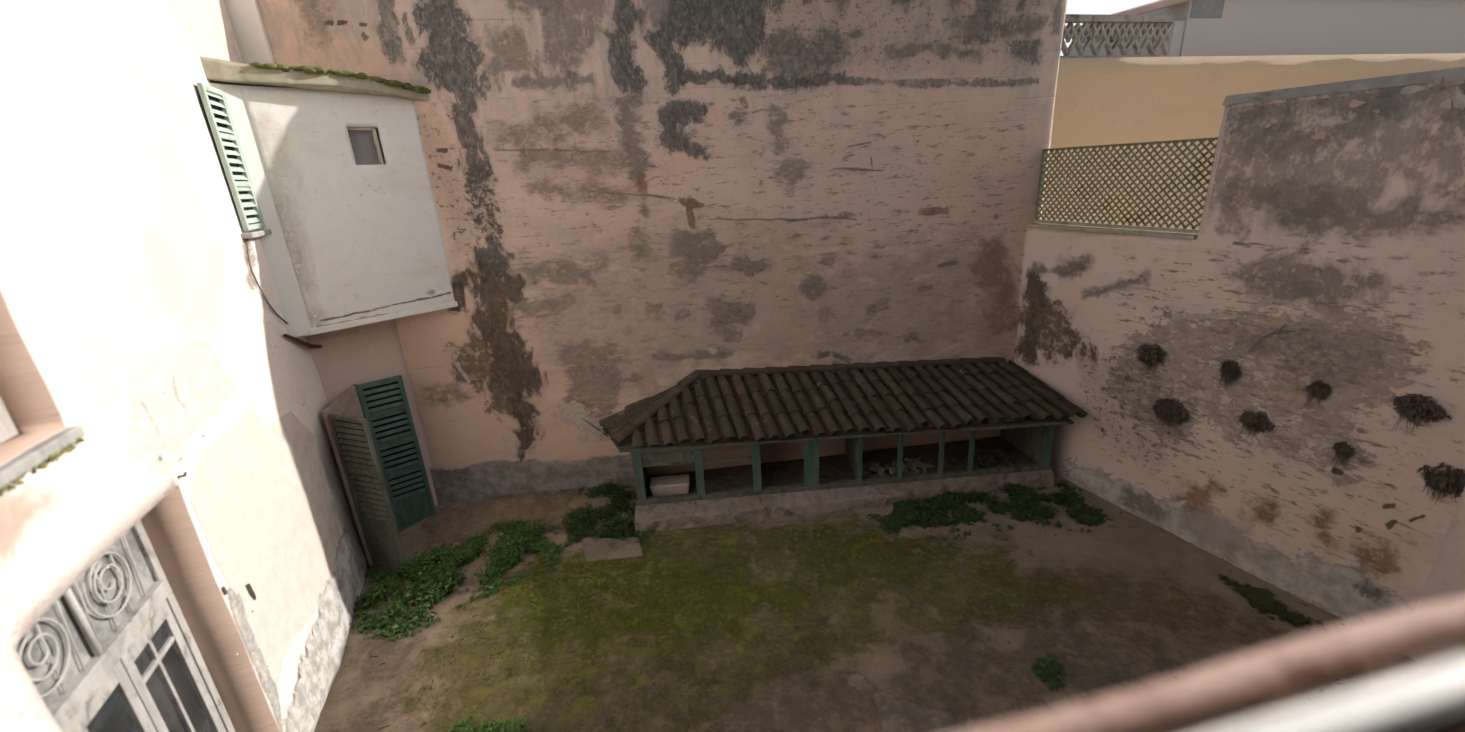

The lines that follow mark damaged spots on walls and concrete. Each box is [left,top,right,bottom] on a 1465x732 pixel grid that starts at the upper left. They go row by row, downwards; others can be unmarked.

leakage [1208,76,1465,240]
leakage [374,0,1063,505]
leakage [1013,256,1099,369]
leakage [1083,275,1147,298]
leakage [1232,251,1382,306]